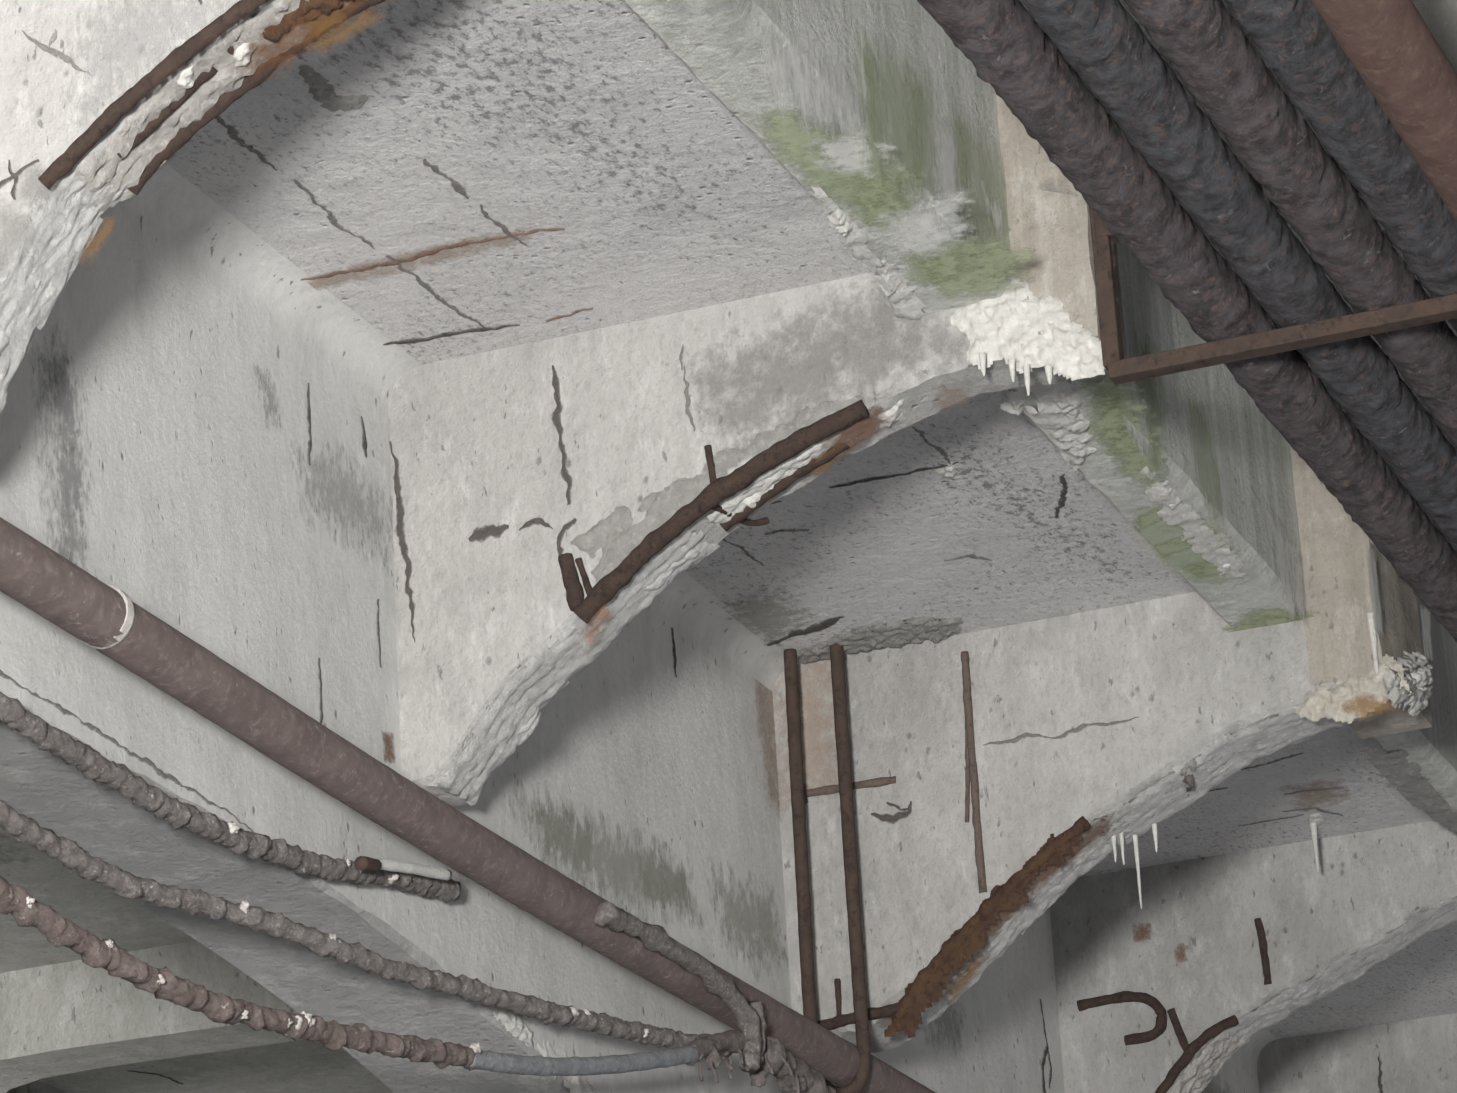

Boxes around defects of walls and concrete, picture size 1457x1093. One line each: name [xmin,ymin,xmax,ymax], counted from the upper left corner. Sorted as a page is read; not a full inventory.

crack [0,159,39,200]
spalling [0,0,386,414]
rust [251,0,374,68]
crack [215,115,593,345]
water stain [308,0,736,259]
water stain [699,32,1249,581]
crack [361,416,415,668]
crack [468,365,577,555]
peeling [436,390,904,806]
rust [948,819,1109,998]
peeling [818,651,1373,1041]
peeling [1077,897,1457,1093]